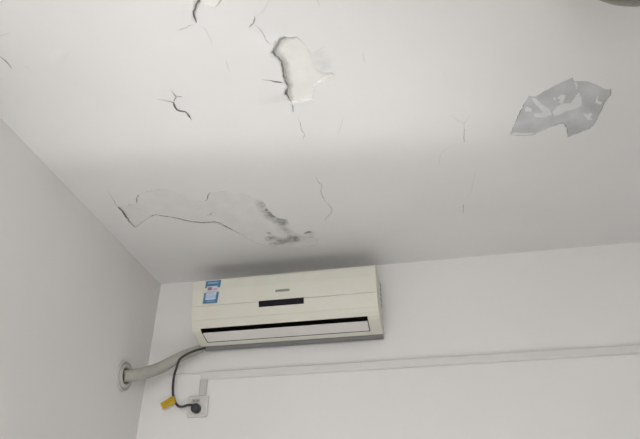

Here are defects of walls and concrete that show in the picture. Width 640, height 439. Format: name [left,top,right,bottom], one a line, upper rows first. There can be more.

crack [176,0,212,45]
peeling [230,27,334,111]
crack [159,92,191,119]
peeling [510,77,612,137]
peeling [108,189,319,248]